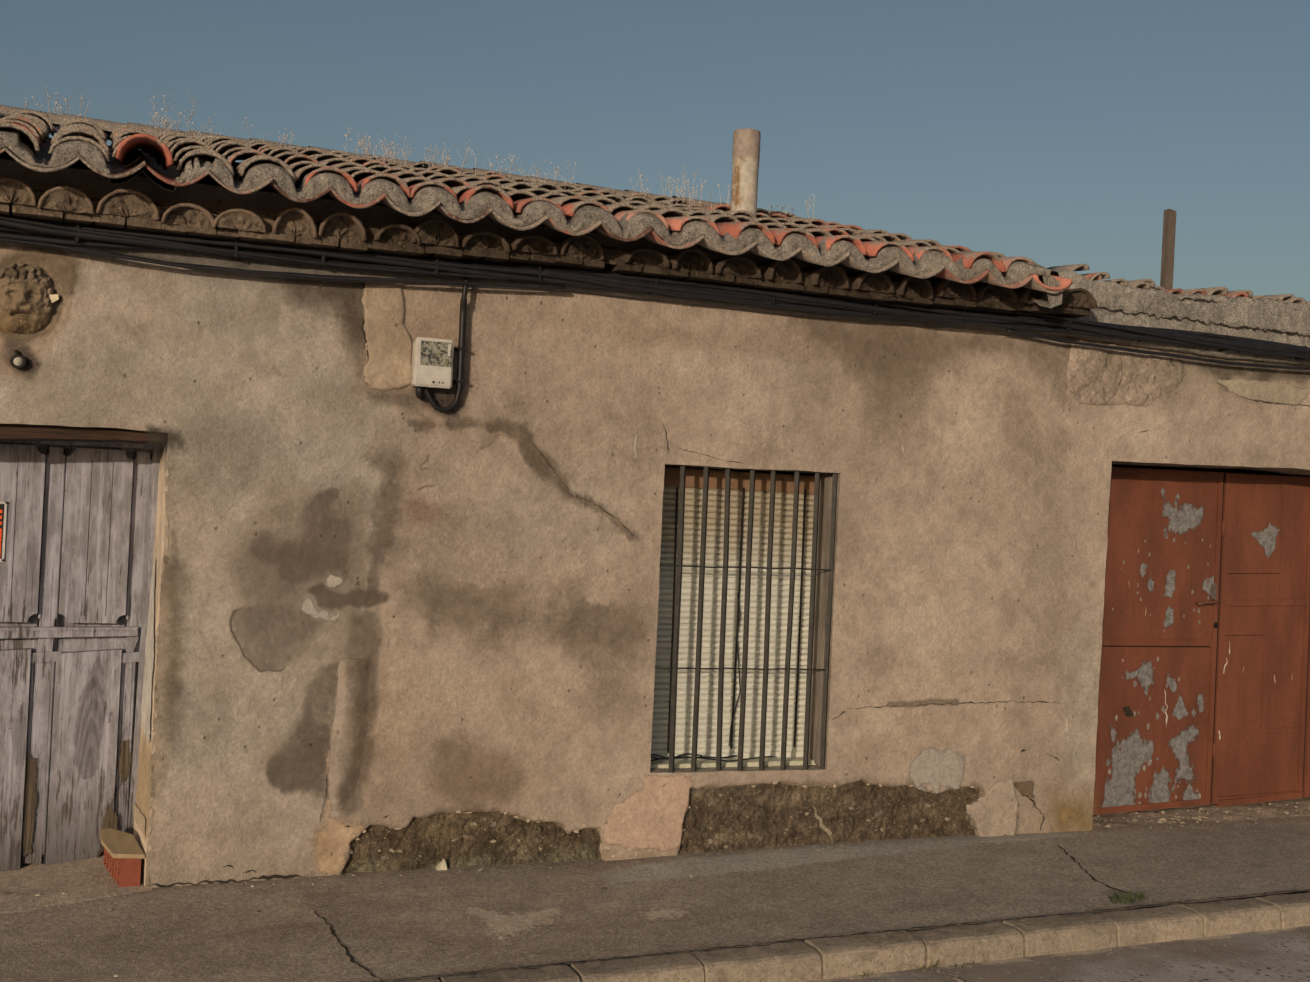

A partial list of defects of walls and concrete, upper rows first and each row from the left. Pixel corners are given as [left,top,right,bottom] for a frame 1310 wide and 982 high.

leakage [229,489,387,672]
crack [832,699,1058,720]
spalling [314,750,602,875]
spalling [678,780,984,854]